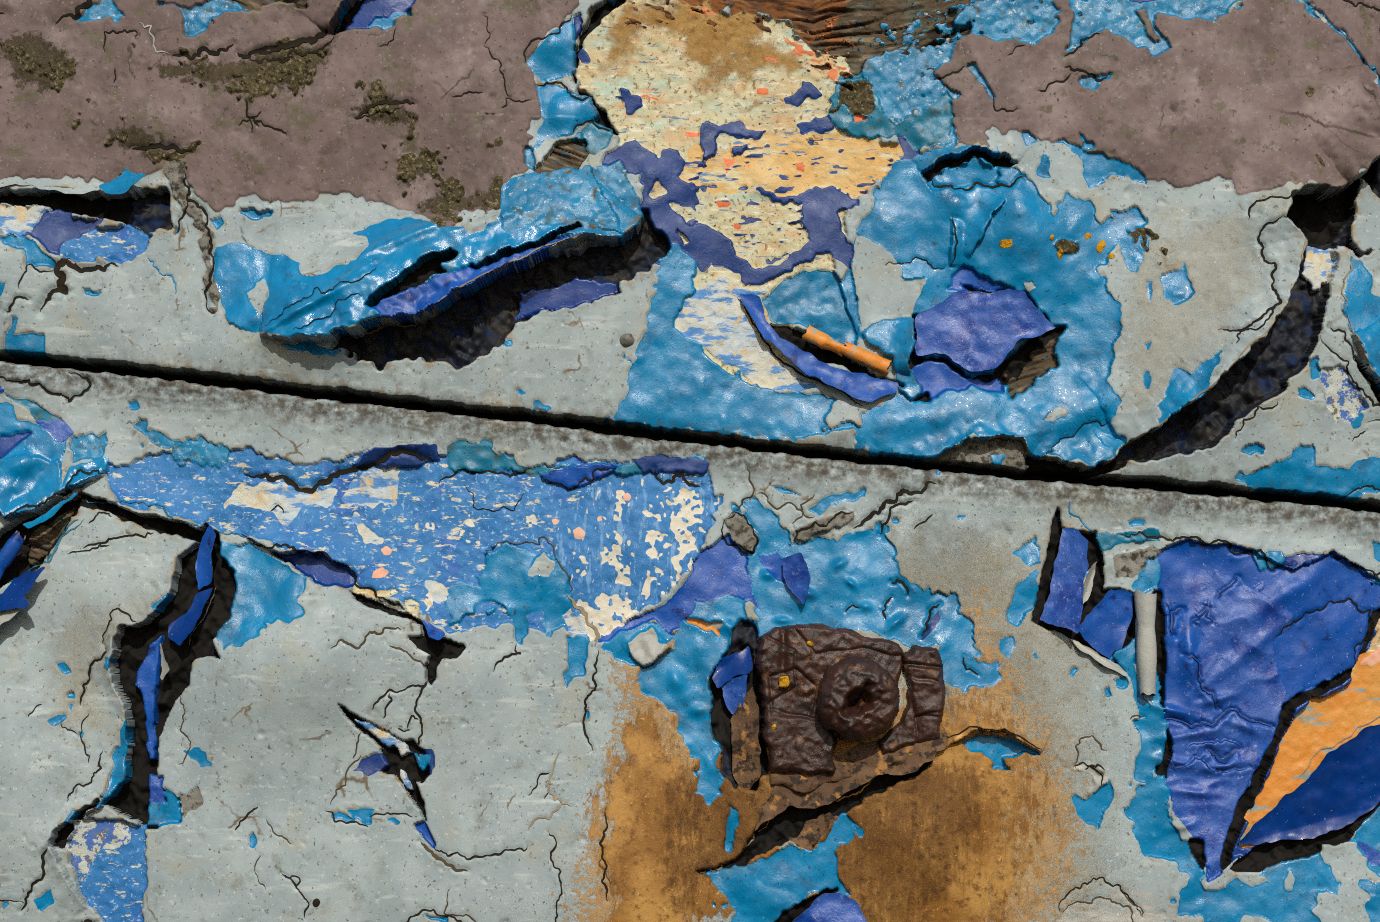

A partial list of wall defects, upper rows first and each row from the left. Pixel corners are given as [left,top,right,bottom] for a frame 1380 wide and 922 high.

peeling [523,0,1380,480]
peeling [1235,445,1380,503]
crack [235,807,310,917]
crack [493,643,521,672]
peeling [0,372,1016,922]
crack [529,650,599,922]
crack [598,809,611,901]
corrosion [548,583,1101,922]
peeling [1006,502,1380,922]